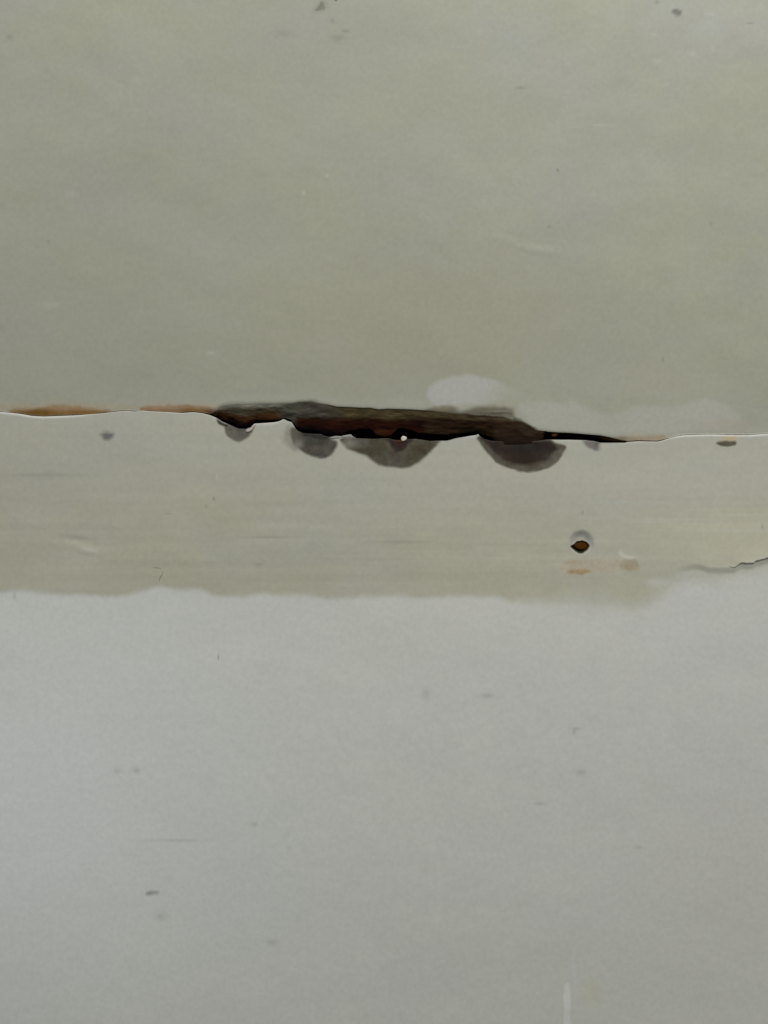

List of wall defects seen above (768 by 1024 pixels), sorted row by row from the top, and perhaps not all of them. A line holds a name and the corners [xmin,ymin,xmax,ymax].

rust [0,401,218,416]
crack [0,402,693,445]
damp [279,423,442,470]
damp [424,403,568,474]